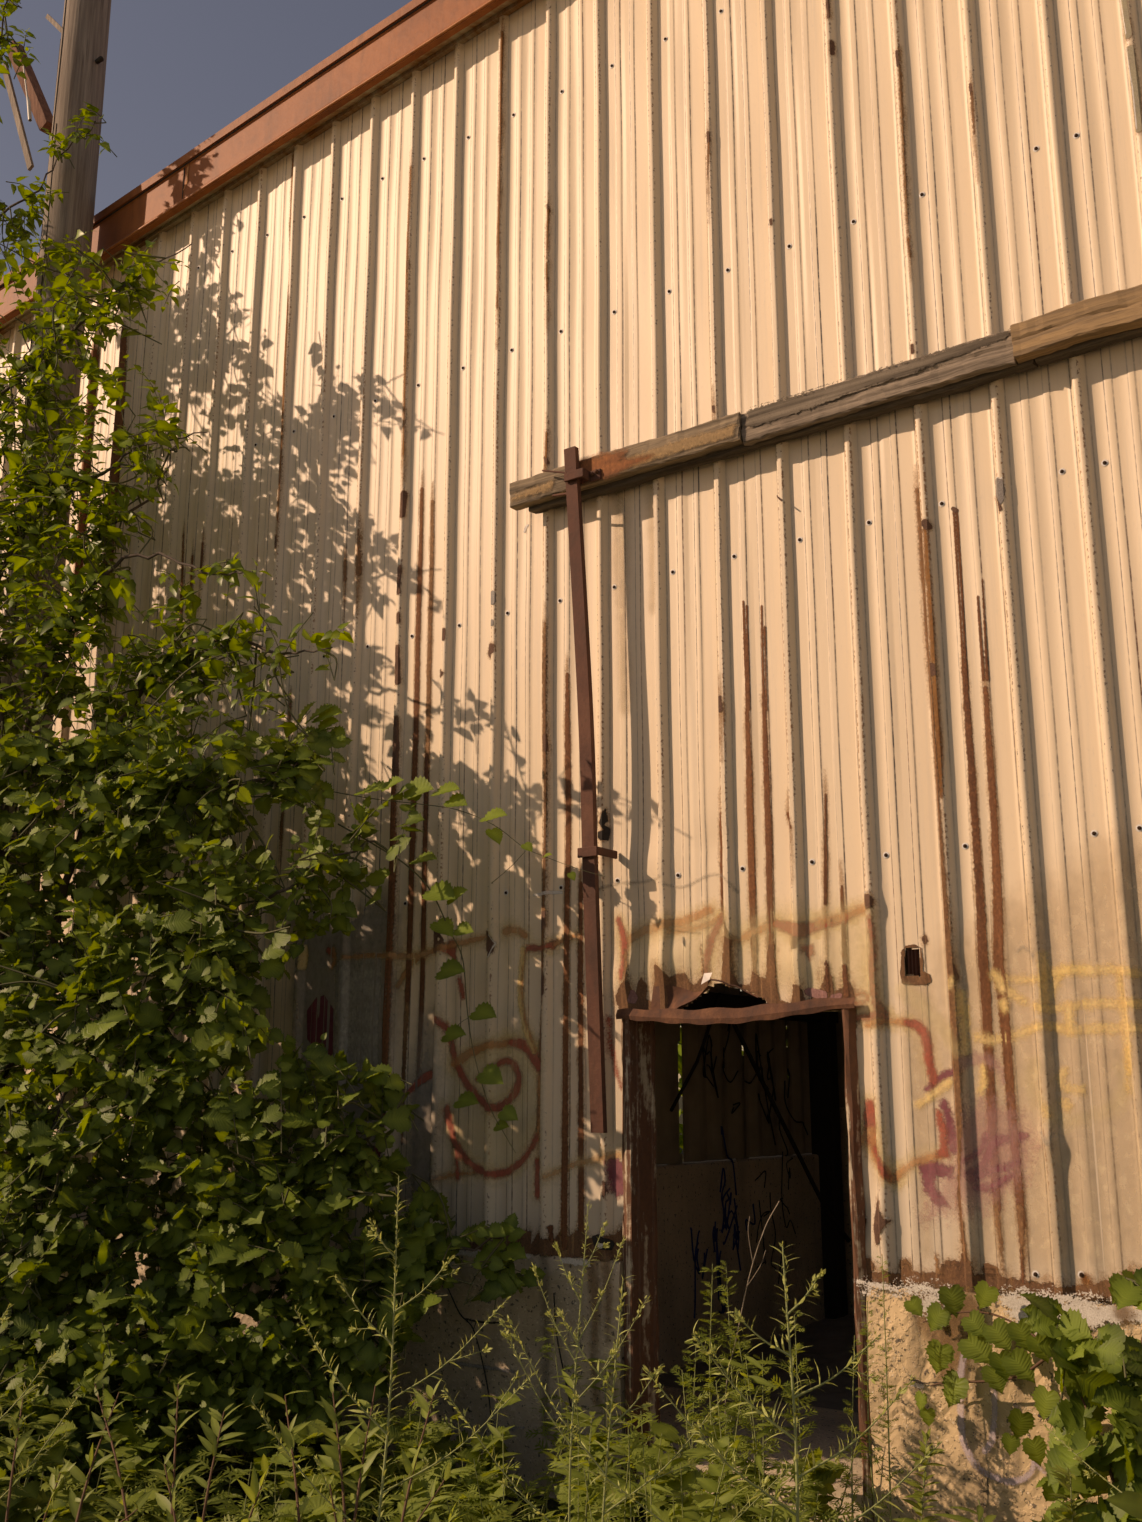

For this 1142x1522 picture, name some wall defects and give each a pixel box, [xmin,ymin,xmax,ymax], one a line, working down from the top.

corrosion [382,166,434,1105]
corrosion [468,622,623,1402]
corrosion [615,601,857,1040]
corrosion [866,486,1129,1377]